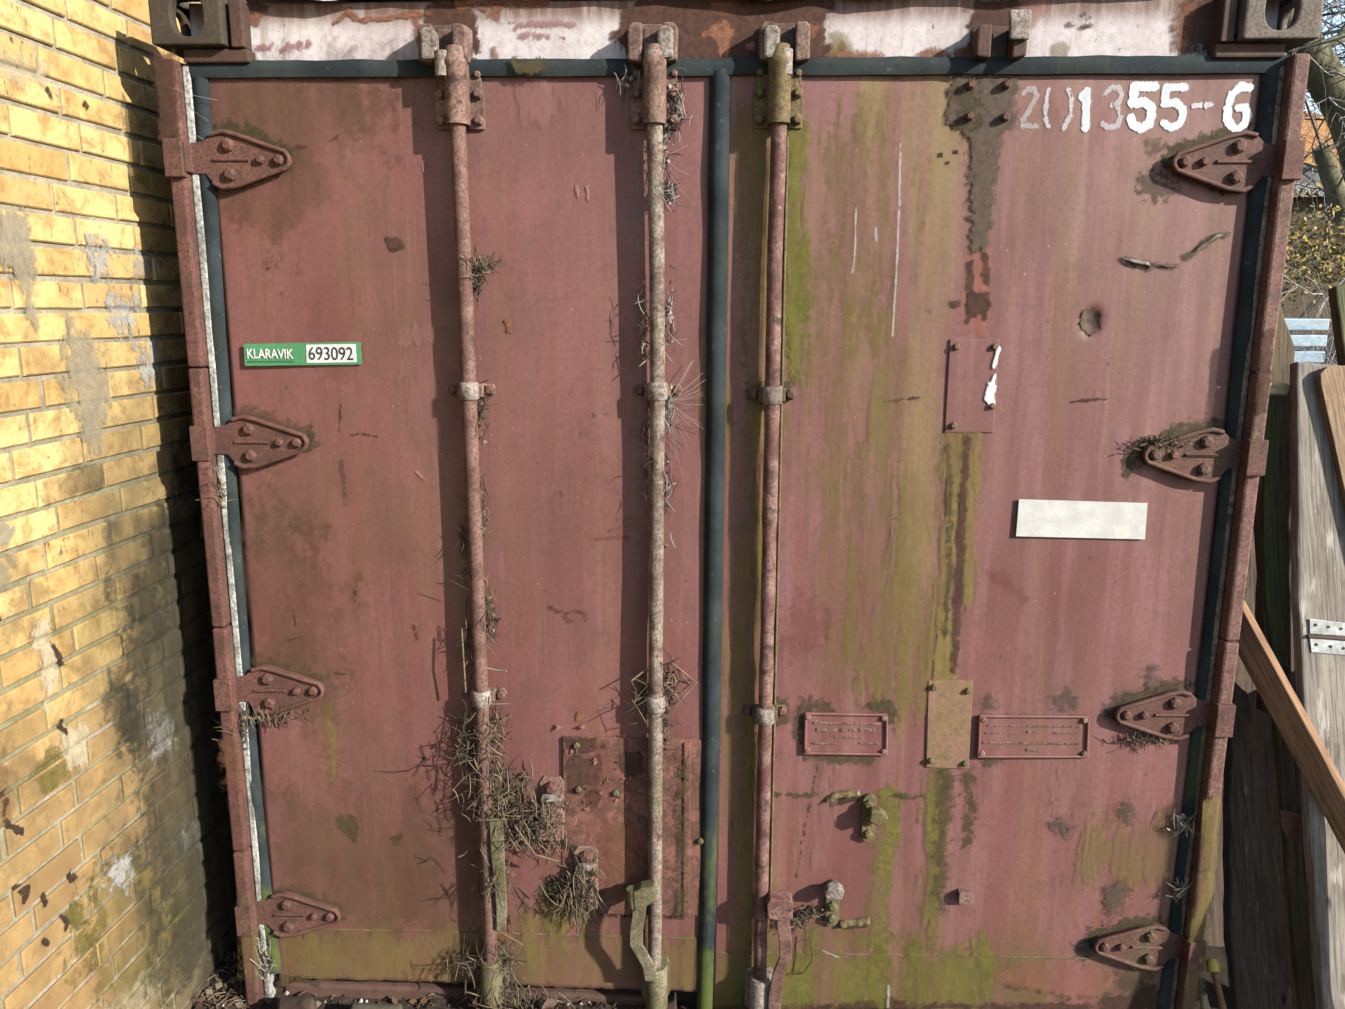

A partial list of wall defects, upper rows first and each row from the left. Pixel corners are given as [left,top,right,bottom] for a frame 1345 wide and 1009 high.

peeling [610,0,836,58]
water stain [62,721,89,770]